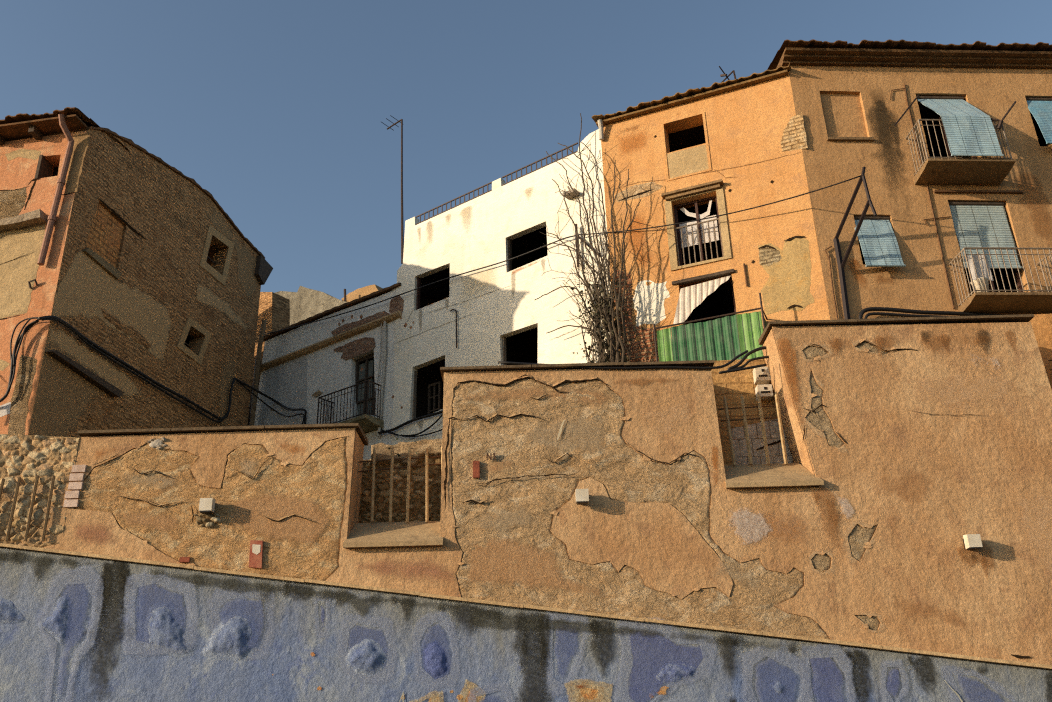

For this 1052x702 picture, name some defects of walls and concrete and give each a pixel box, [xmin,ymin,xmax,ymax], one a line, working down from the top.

leakage [871,101,898,173]
crack [0,179,36,210]
flaking render [331,296,414,360]
flaking render [612,269,670,362]
spalling [751,237,814,315]
spalling [800,344,847,452]
spalling [75,435,348,581]
spalling [450,378,855,702]
spalling [844,522,878,562]
leakage [90,561,130,693]
leakage [153,570,418,619]
leakage [439,604,656,702]